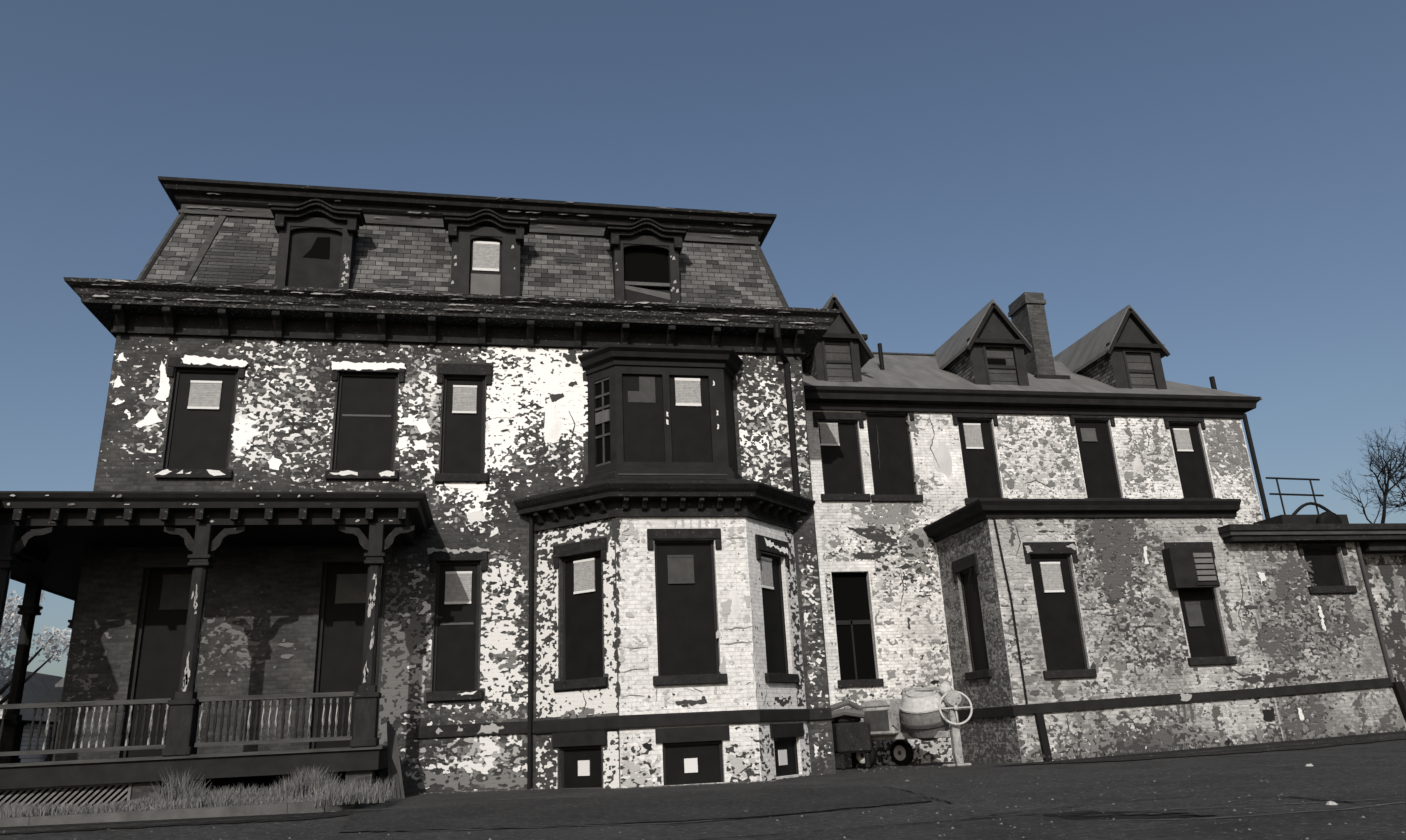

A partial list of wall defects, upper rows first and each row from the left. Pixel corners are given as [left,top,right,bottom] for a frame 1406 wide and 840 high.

peeling [101,336,177,481]
peeling [736,355,810,498]
peeling [62,616,128,714]
peeling [198,339,590,791]
peeling [595,518,652,710]
spalling [604,732,662,787]
peeling [643,693,707,708]
peeling [721,417,1406,783]